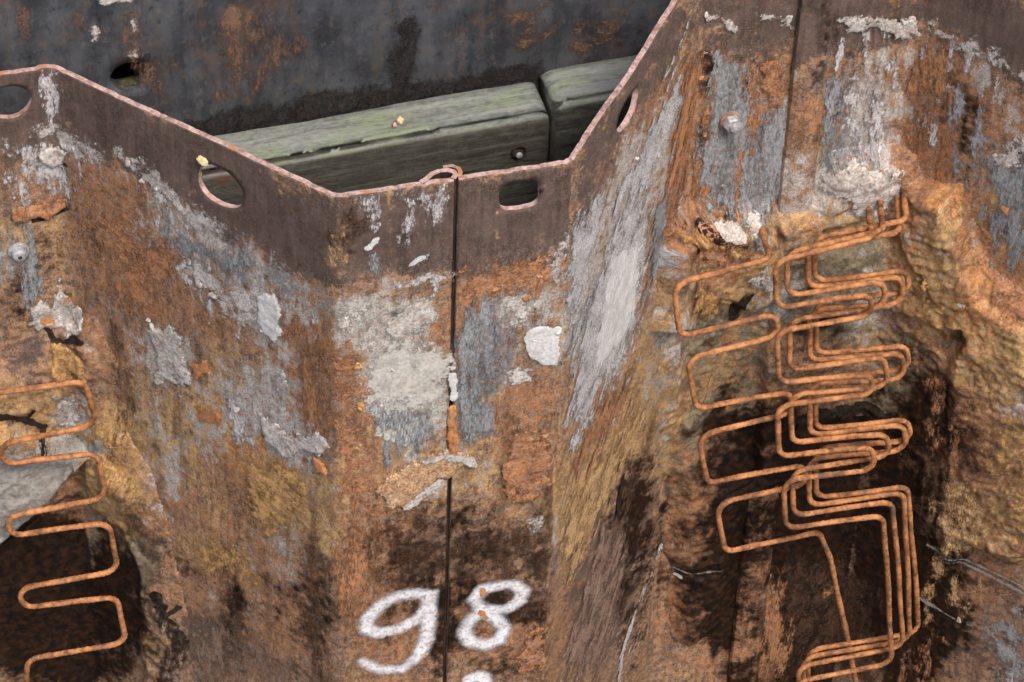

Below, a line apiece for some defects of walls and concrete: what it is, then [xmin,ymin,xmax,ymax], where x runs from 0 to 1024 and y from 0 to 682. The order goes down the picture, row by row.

corrosion [654,43,786,268]
spalling [819,77,904,219]
corrosion [886,41,962,206]
peeling [947,73,1024,276]
corrosion [99,204,199,327]
peeling [145,318,192,397]
peeling [257,292,283,343]
spalling [0,429,110,544]
peeling [259,413,331,458]
corrosion [278,301,381,682]
corrosion [514,627,549,680]
water stain [772,550,893,682]